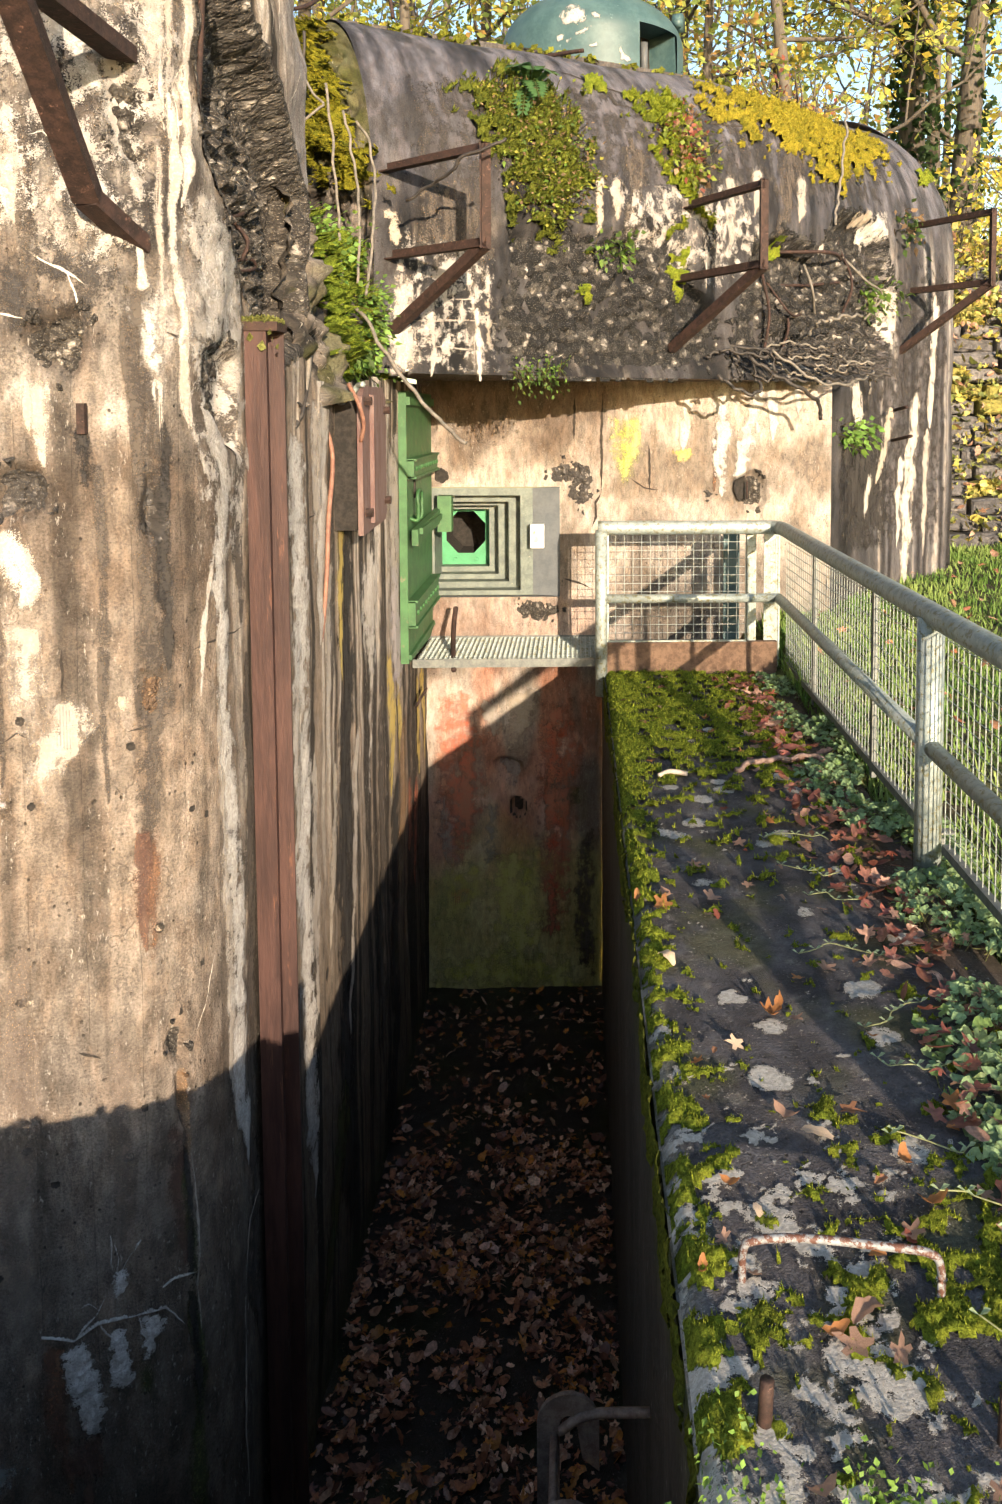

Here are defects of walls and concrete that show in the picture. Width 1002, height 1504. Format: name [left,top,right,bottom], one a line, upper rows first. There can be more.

spalling [190,0,311,370]
spalling [19,297,98,392]
spalling [489,205,898,385]
spalling [0,456,59,525]
spalling [543,455,600,515]
spalling [703,469,766,514]
damp [0,0,263,1340]
spalling [510,796,527,818]
rust [132,829,161,958]
damp [287,402,597,1343]
damp [41,1109,213,1504]